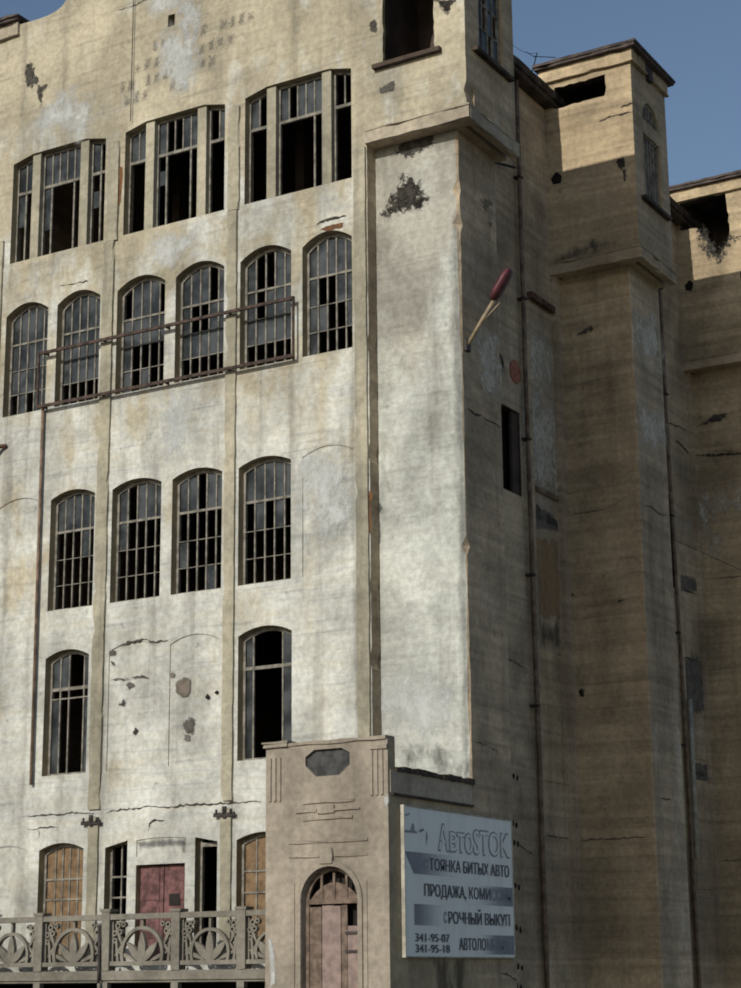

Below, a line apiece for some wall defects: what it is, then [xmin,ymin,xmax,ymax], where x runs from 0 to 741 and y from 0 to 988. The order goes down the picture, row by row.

peeling [24,62,48,105]
peeling [391,135,434,158]
peeling [380,173,429,217]
spalling [696,226,740,263]
peeling [170,672,191,697]
peeling [181,717,195,741]
crack [29,801,261,835]